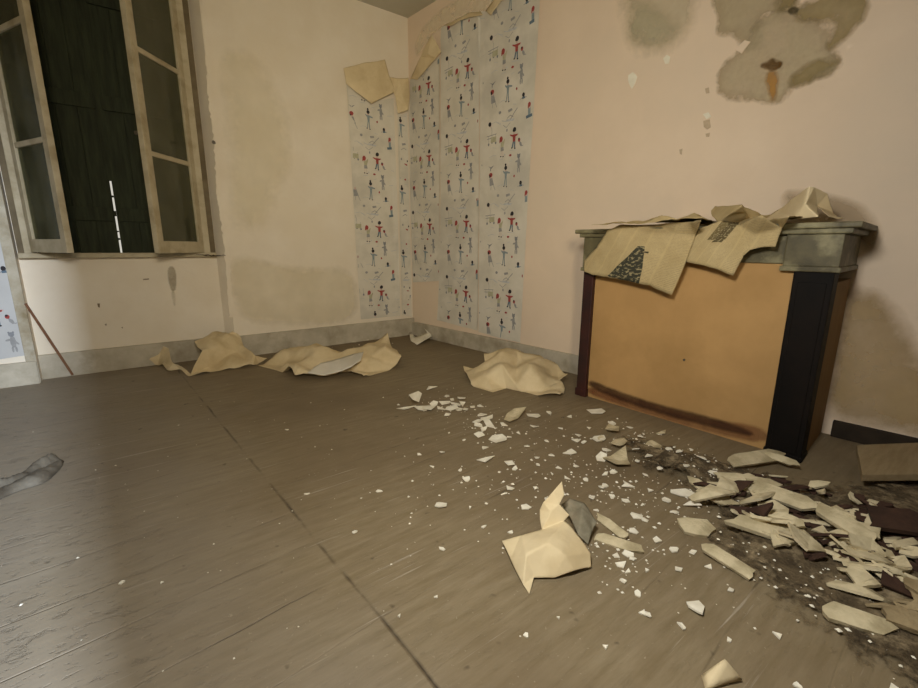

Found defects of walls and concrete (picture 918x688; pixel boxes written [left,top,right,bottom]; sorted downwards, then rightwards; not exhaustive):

damp [714,0,867,103]